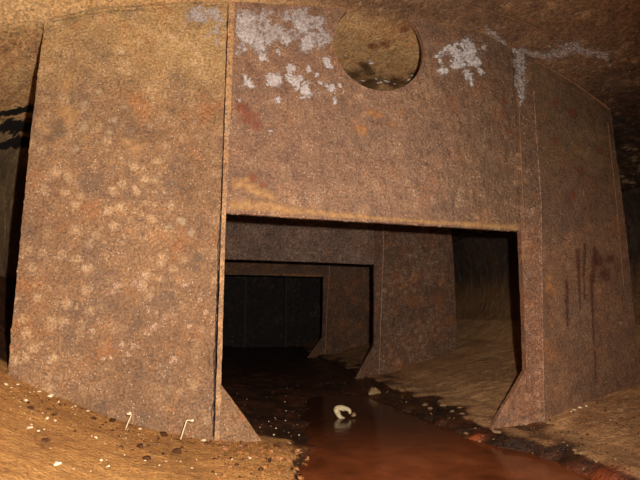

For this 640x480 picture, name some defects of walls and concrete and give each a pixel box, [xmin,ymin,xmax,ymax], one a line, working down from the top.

damp [186,3,225,45]
damp [235,6,333,61]
damp [264,64,342,105]
damp [435,38,487,86]
damp [477,26,610,106]